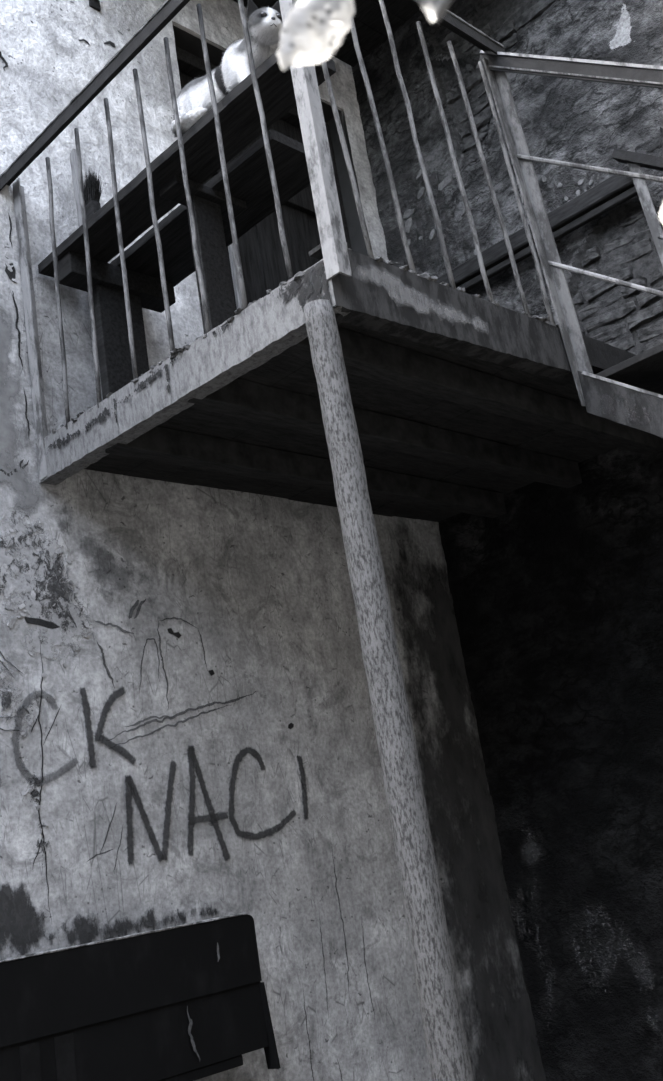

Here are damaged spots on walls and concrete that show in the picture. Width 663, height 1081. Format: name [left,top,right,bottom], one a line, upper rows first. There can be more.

peeling [608,4,635,51]
crack [0,291,30,477]
peeling [0,511,94,668]
crack [30,636,61,921]
leakage [0,883,217,956]